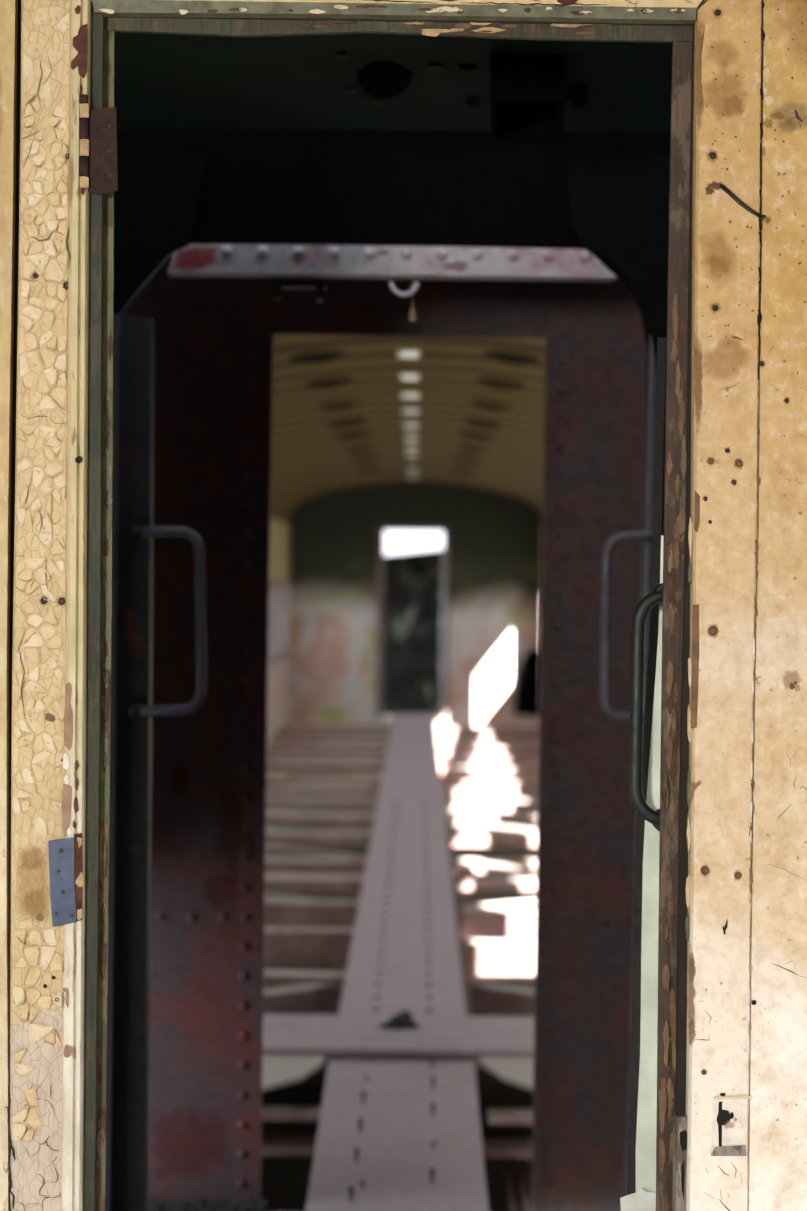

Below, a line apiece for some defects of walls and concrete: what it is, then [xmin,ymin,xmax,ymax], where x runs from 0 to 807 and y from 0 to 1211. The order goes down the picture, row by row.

peeling [309,4,464,15]
crack [373,0,638,13]
peeling [546,6,686,15]
crack [22,57,52,168]
peeling [19,6,69,410]
crack [21,214,70,269]
rust [175,248,216,270]
crack [26,483,53,590]
crack [18,629,26,720]
peeling [3,425,79,837]
crack [704,0,807,1211]
peeling [3,913,75,1143]